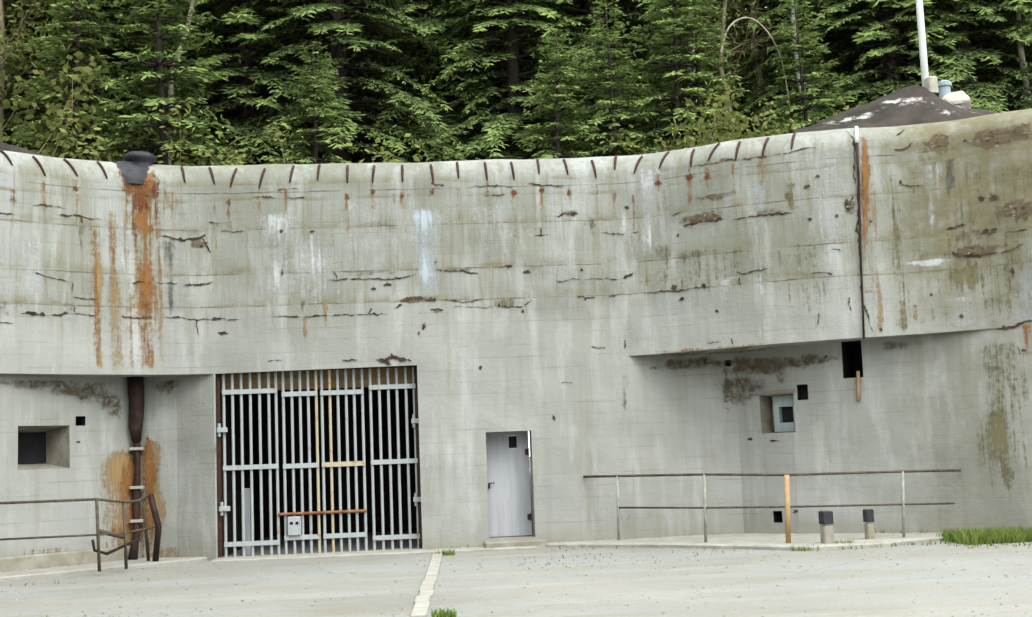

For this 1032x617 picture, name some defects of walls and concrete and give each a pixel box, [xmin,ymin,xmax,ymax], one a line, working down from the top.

corrosion [91,169,173,367]
spalling [683,211,721,222]
corrosion [859,138,877,248]
spalling [924,135,949,148]
spalling [963,121,1028,149]
spalling [978,195,1032,232]
leakage [982,344,1026,487]
corrosion [102,437,166,546]